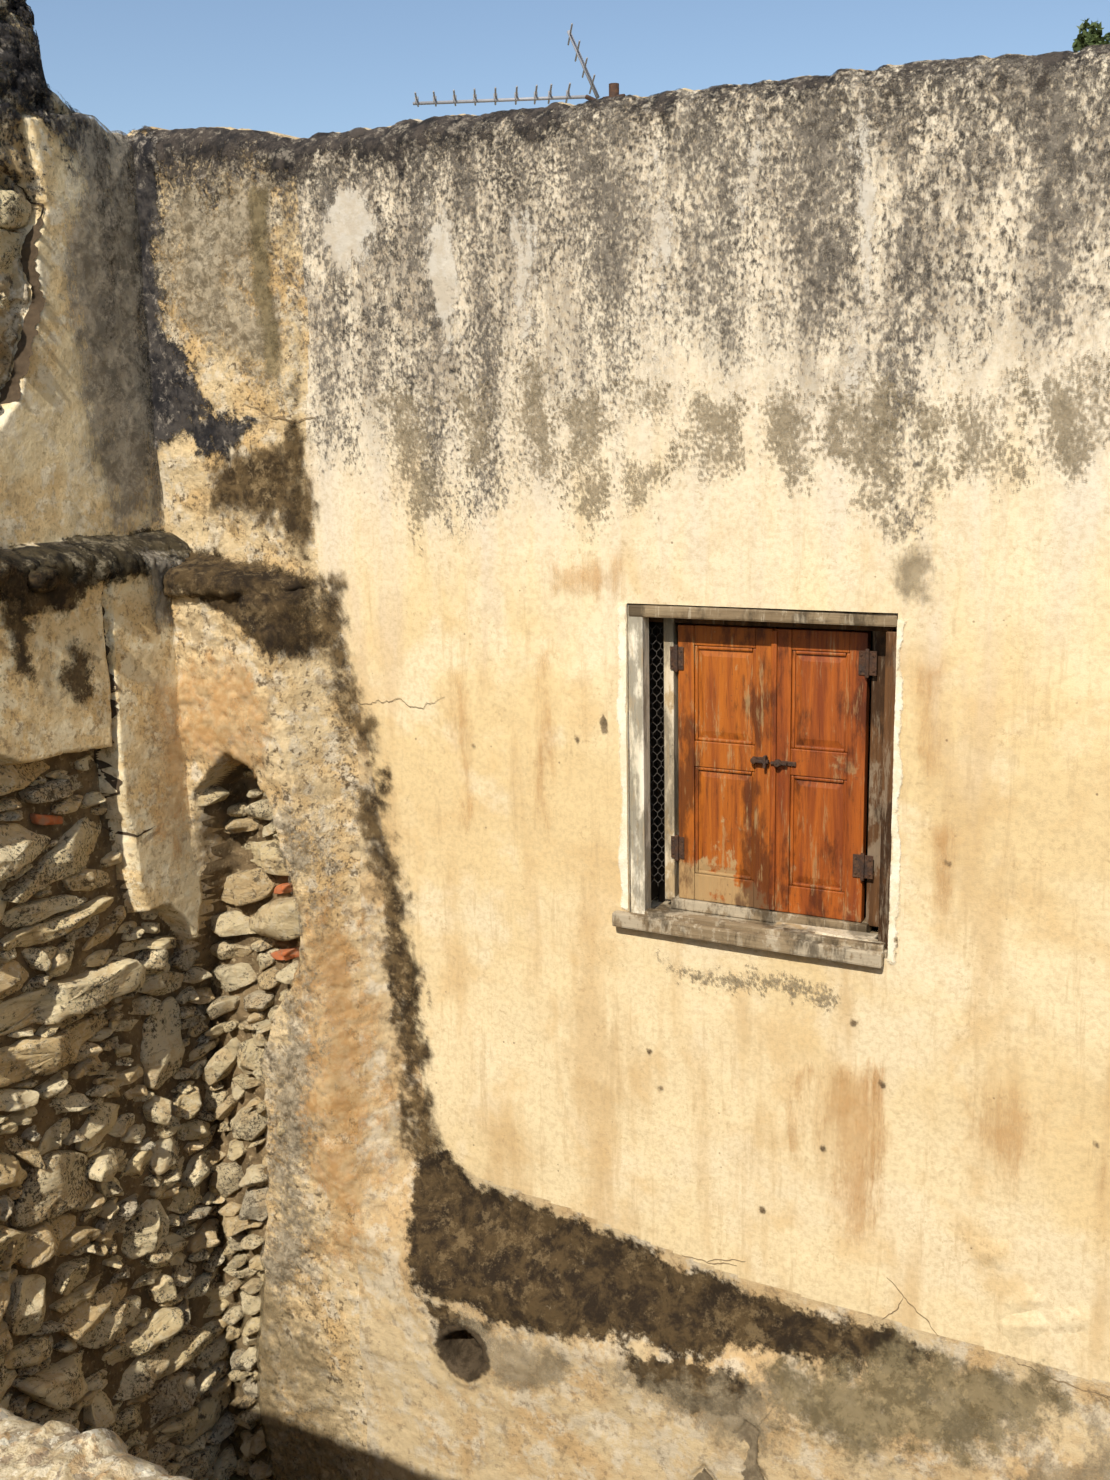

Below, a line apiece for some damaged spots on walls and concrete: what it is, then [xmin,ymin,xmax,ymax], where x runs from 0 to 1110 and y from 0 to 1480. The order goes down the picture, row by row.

flaking render [0,190,32,312]
crack [0,160,46,410]
damp [45,44,1110,599]
damp [141,549,188,630]
damp [2,594,39,687]
damp [59,637,96,705]
damp [411,1287,491,1333]
crack [884,1277,937,1334]
damp [620,1343,763,1416]
crack [1018,1364,1110,1400]
peeling [694,1468,713,1480]
peeling [732,1419,765,1480]